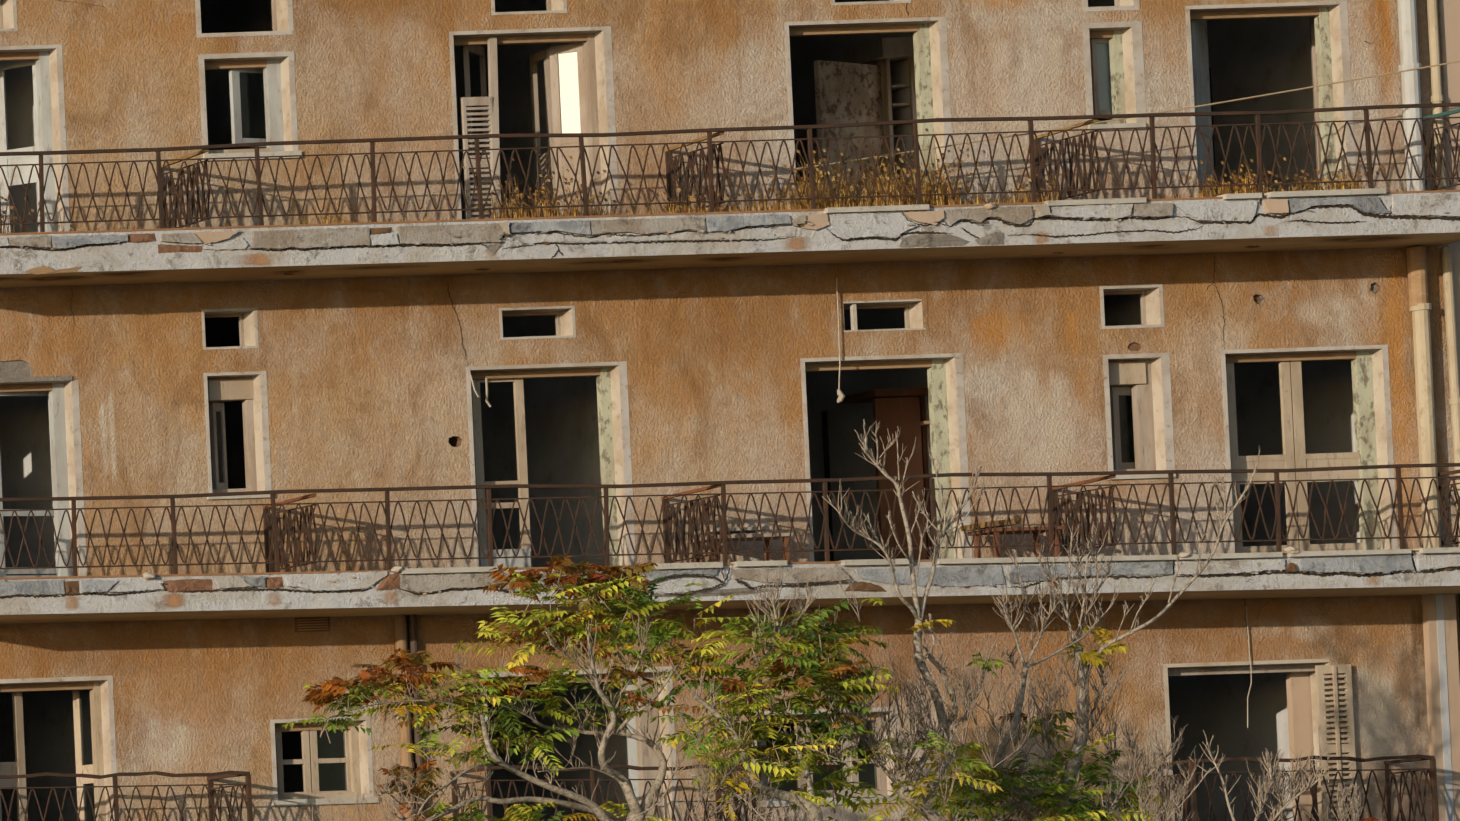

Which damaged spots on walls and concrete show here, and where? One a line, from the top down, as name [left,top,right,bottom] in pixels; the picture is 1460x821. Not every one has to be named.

crack [0,242,127,251]
flaking render [0,194,1460,274]
crack [255,198,1460,348]
crack [447,282,468,363]
crack [0,580,541,599]
crack [1008,553,1460,654]